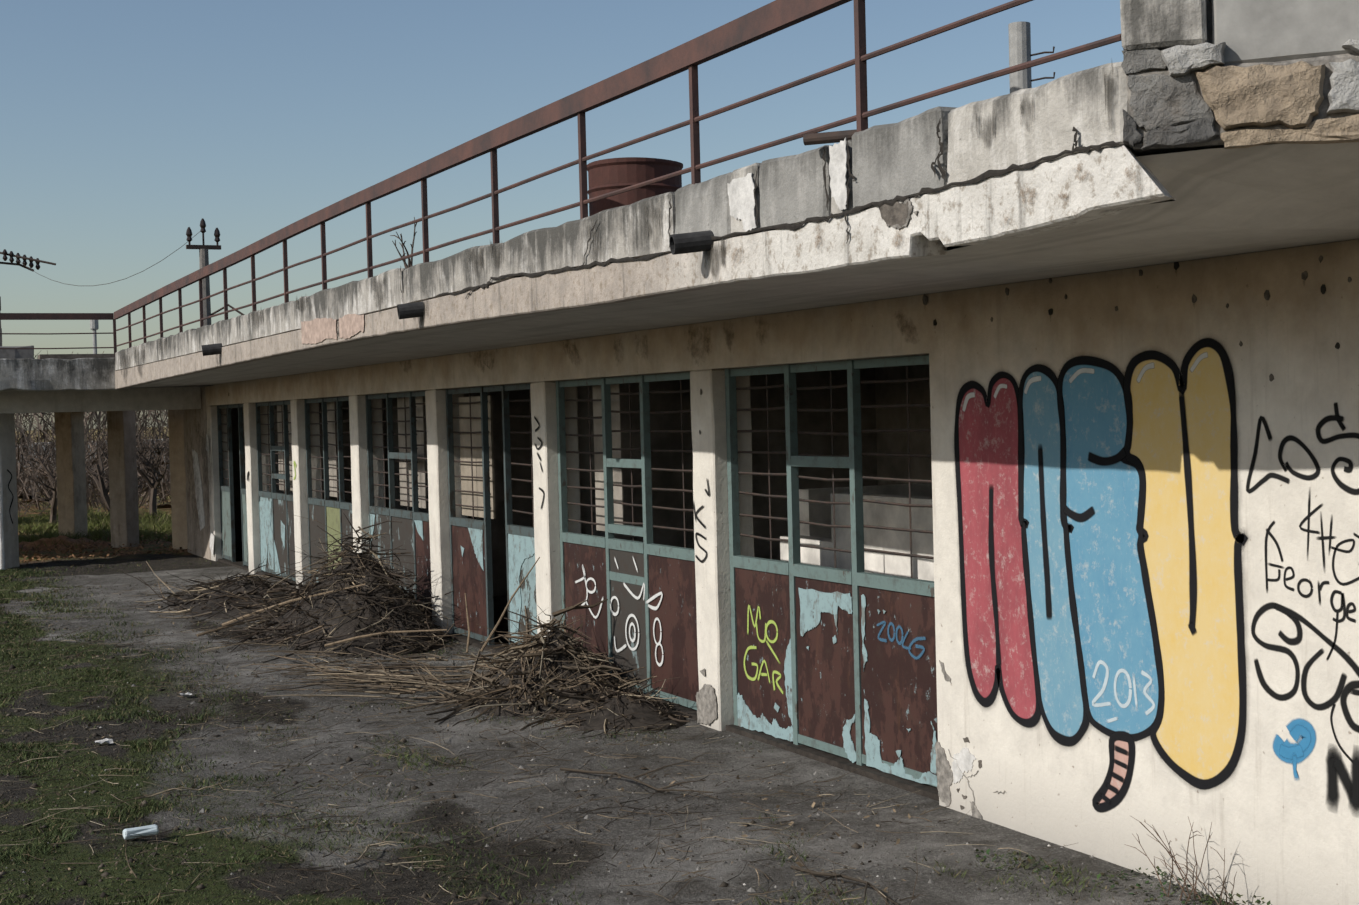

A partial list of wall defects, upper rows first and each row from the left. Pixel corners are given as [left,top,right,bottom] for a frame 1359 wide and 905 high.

crack [400,198,672,303]
leakage [704,239,724,275]
flaking render [879,198,918,230]
crack [711,120,1120,244]
peeling [460,528,484,571]
peeling [508,534,535,634]
flaking render [696,668,717,726]
peeling [737,588,886,741]
peeling [842,699,984,820]